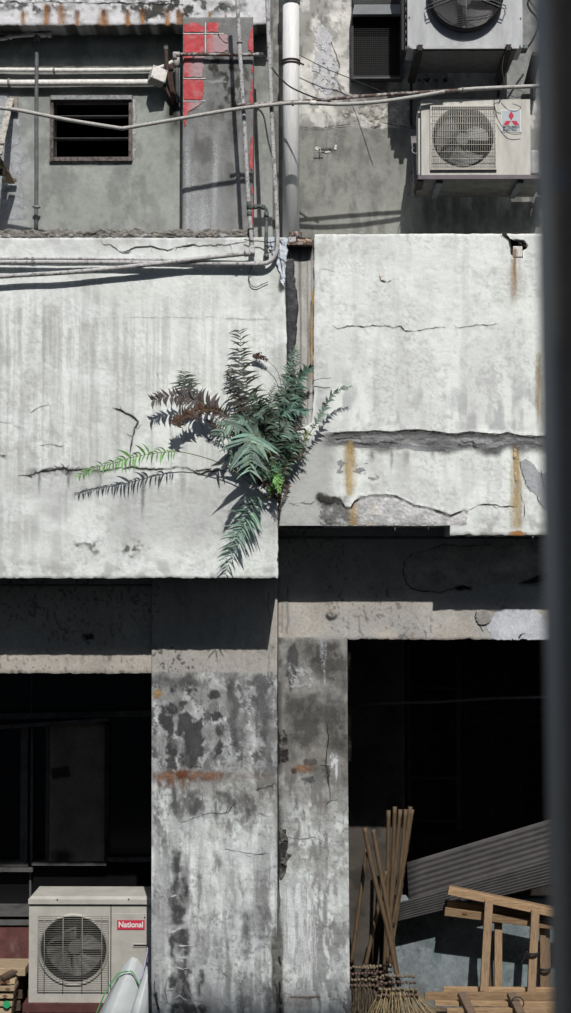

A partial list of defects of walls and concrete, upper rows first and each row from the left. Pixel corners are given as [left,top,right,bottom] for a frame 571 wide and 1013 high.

peeling [300,25,417,174]
crack [333,322,497,331]
crack [2,406,231,477]
corrosion [345,438,354,494]
flaking render [316,491,468,525]
flaking render [323,426,542,516]
corrosion [511,446,523,535]
flaking render [475,604,545,640]
water stain [172,789,201,814]
corrosion [157,770,224,784]
water stain [217,792,234,807]
water stain [167,851,206,1013]